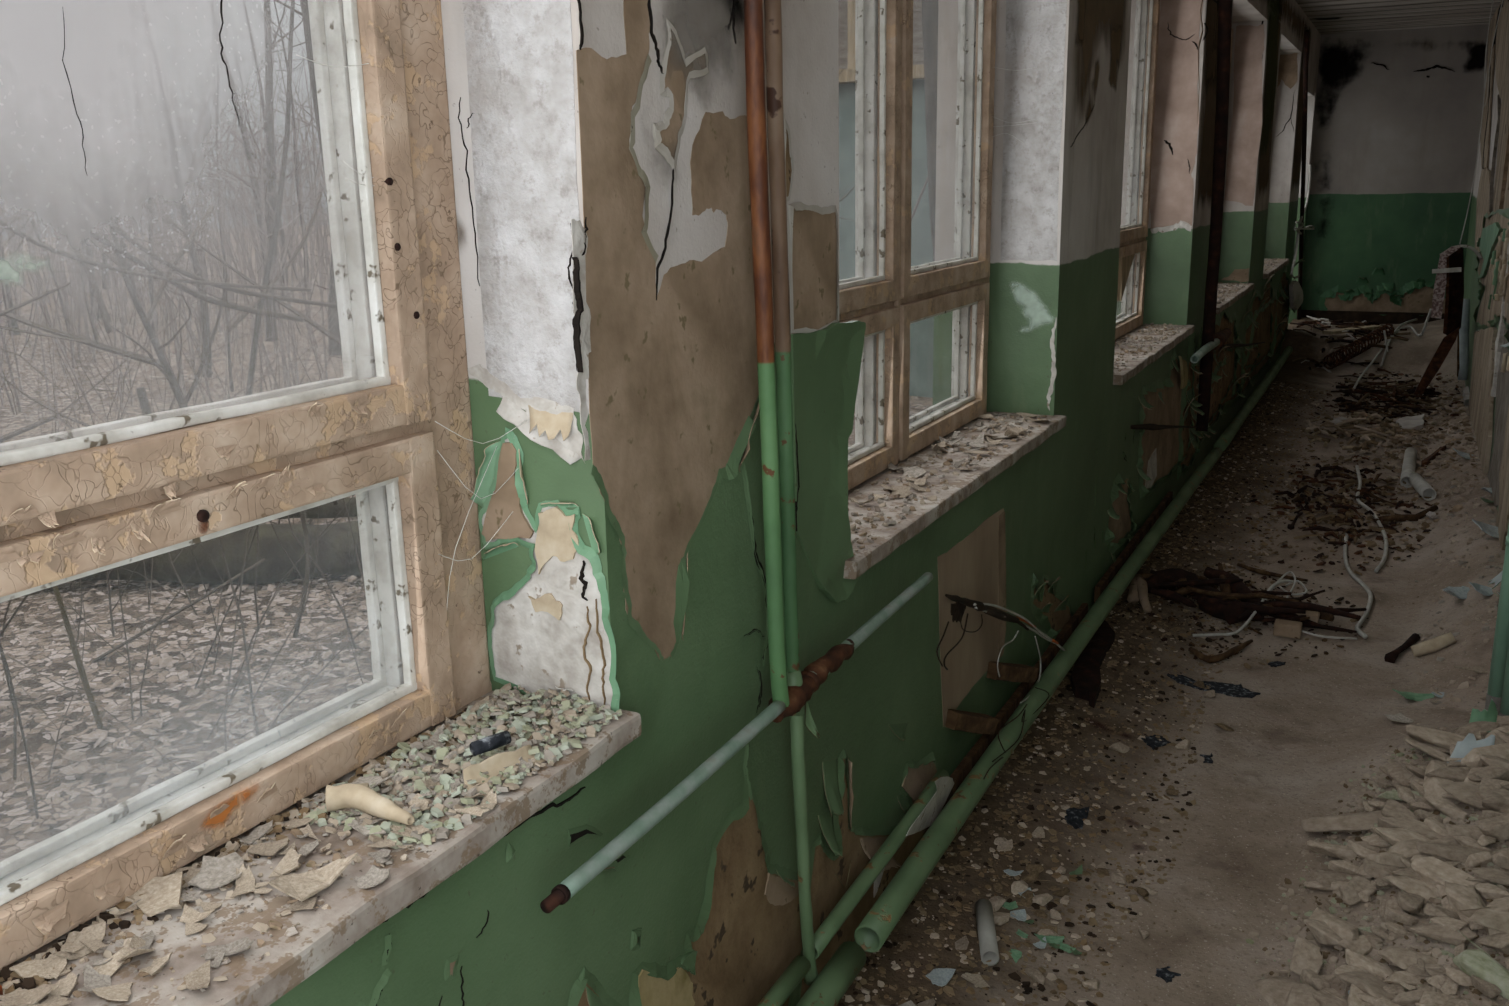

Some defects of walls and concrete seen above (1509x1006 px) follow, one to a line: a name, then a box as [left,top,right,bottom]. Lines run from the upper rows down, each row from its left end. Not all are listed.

crack [647,0,664,74]
damp [1077,0,1126,122]
damp [1197,0,1219,205]
damp [1257,0,1363,194]
peeling [468,0,759,712]
crack [656,169,674,300]
peeling [1473,208,1509,373]
corrosion [801,639,855,692]
flaking render [938,508,1006,727]
peeling [567,748,938,1006]